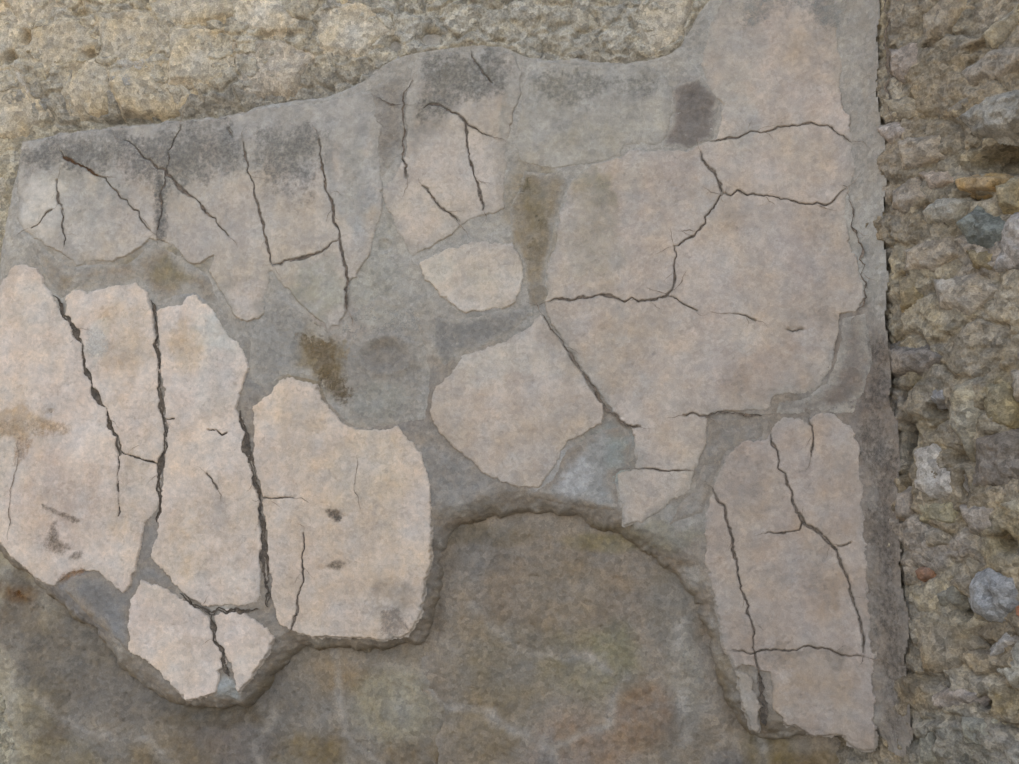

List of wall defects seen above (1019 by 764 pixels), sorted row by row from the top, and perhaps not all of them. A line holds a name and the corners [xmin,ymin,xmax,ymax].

crack [16,105,237,248]
crack [228,125,353,326]
crack [369,71,509,235]
flaking render [17,0,873,527]
crack [53,295,173,522]
crack [180,412,306,676]
crack [280,523,312,646]
spalling [0,243,879,764]
crack [526,118,887,726]